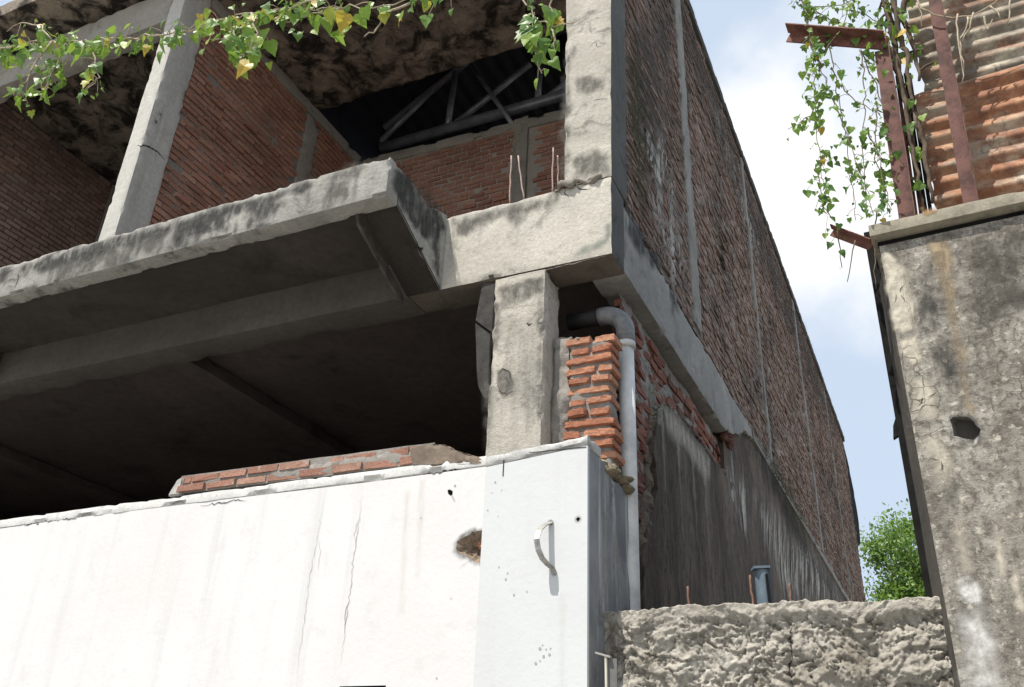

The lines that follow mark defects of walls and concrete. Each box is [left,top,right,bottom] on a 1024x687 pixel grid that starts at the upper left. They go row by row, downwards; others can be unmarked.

spalling [554,173,602,193]
crack [902,345,943,438]
spalling [716,429,734,450]
spalling [950,416,981,442]
spalling [638,403,729,556]
water stain [730,475,747,531]
spalling [456,529,482,565]
water stain [761,511,835,599]